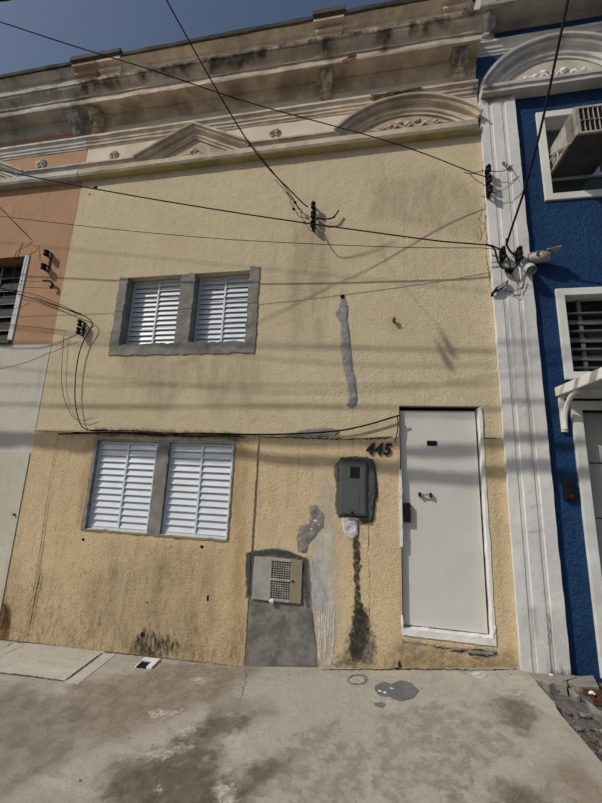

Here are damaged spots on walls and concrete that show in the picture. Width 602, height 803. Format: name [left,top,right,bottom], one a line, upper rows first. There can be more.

spalling [296,505,324,553]
water stain [318,526,375,666]
water stain [134,629,179,657]
spalling [401,639,497,658]